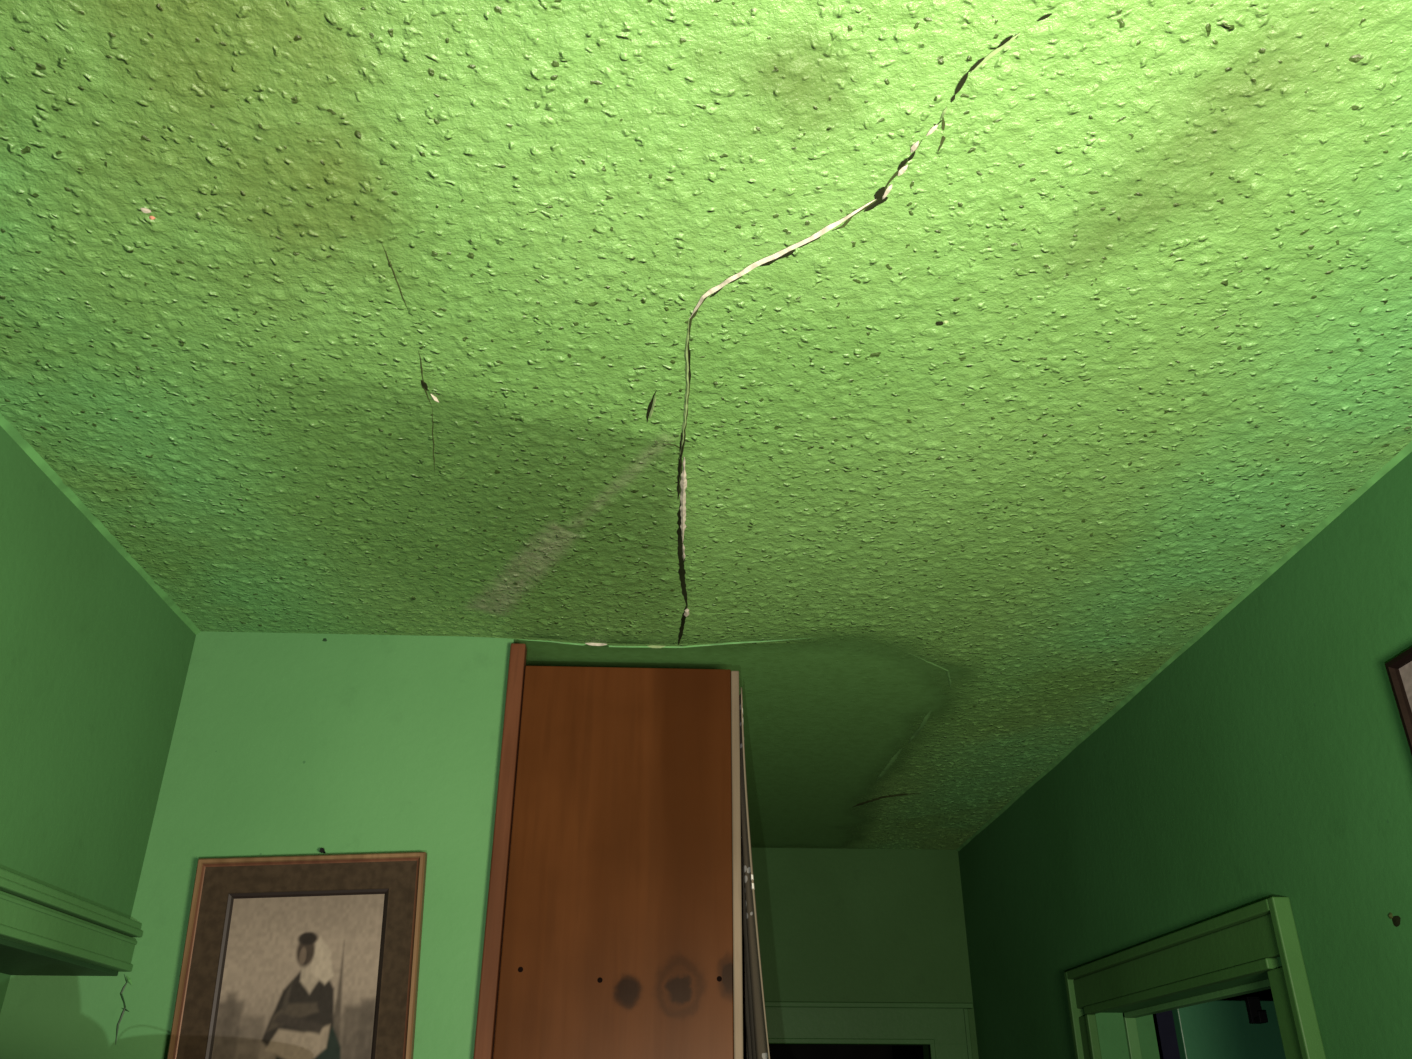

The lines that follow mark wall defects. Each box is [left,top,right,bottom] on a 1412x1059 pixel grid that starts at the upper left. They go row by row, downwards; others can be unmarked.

crack [507,14,1052,648]